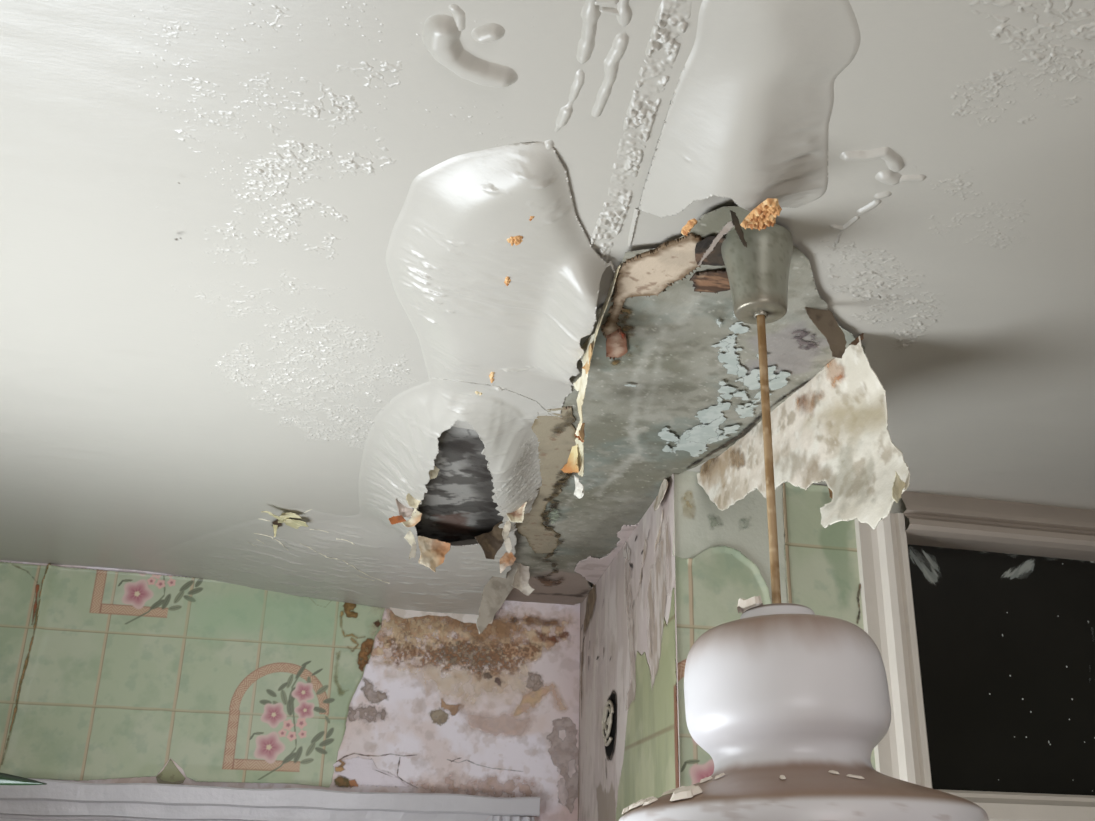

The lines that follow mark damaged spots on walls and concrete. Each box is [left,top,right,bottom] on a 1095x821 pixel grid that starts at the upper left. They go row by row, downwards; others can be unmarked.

flaking render [740,198,782,231]
spalling [681,218,726,266]
flaking render [606,328,628,360]
water stain [792,331,818,350]
water stain [537,471,576,586]
flaking render [653,471,787,614]
water stain [625,511,670,709]
flaking render [333,756,409,788]
peeling [547,717,579,813]